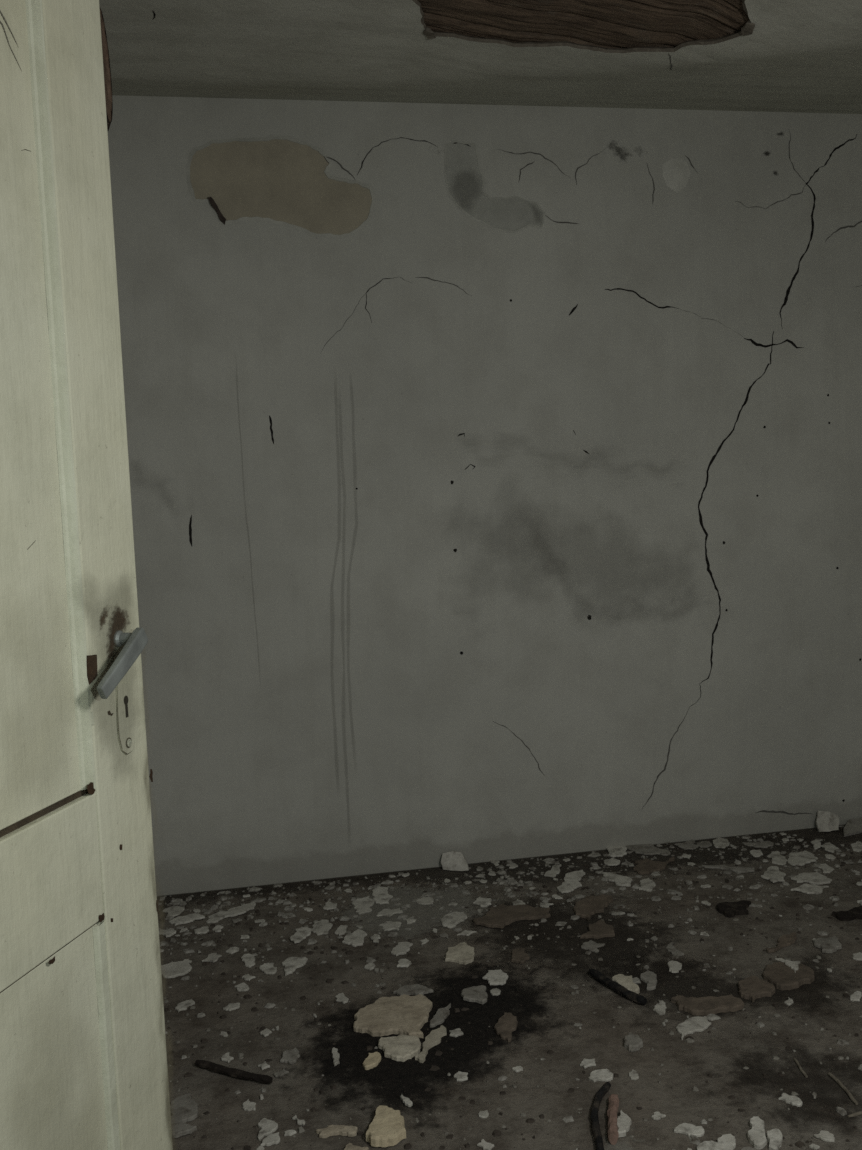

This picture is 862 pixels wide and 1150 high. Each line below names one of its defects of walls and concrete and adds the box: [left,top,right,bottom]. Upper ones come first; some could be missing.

flaking render [412,0,755,53]
crack [357,137,469,175]
crack [499,149,605,185]
crack [325,277,469,345]
crack [605,131,862,809]